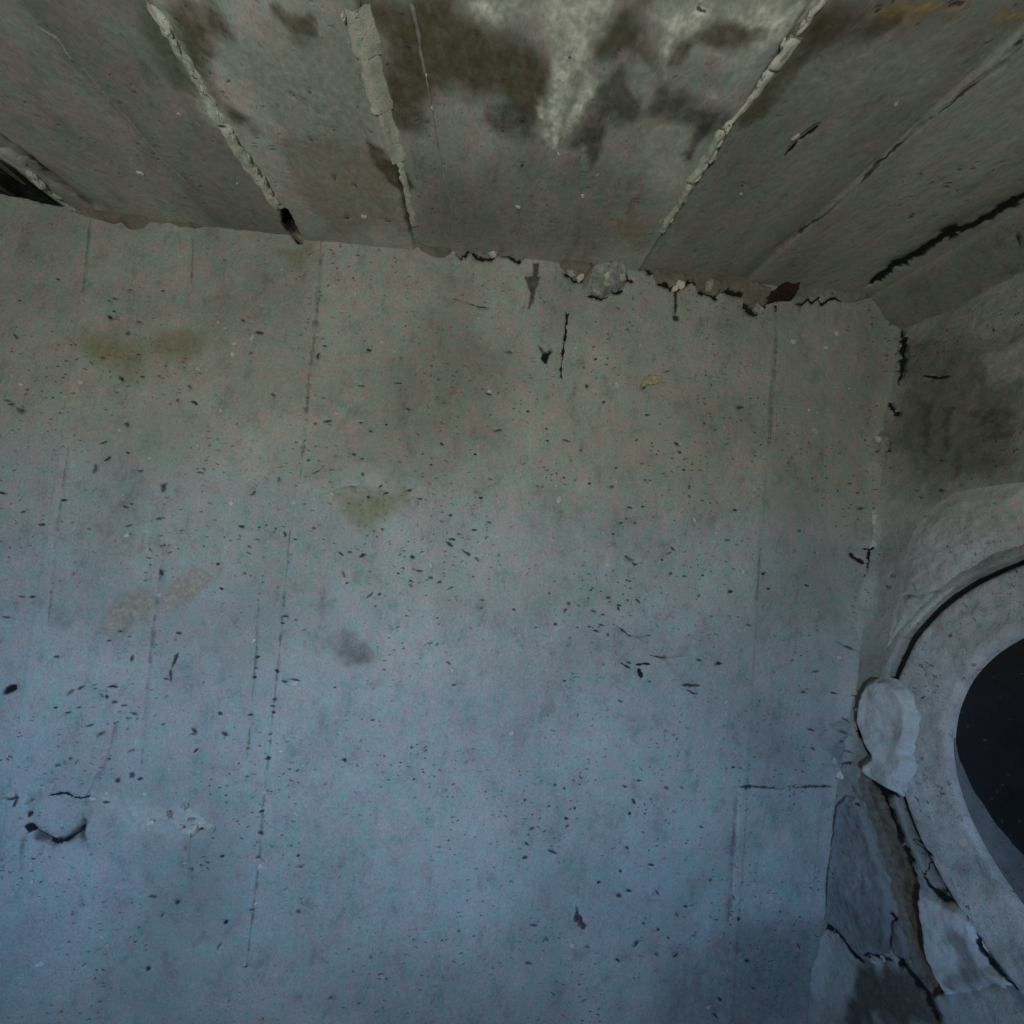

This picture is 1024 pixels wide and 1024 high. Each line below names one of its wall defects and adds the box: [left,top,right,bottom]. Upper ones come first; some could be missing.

leakage [660,0,816,66]
leakage [371,0,639,161]
crack [784,125,819,156]
spalling [559,260,627,296]
crack [559,263,842,378]
crack [888,330,950,416]
crack [9,792,89,844]
crack [836,715,959,907]
spalling [858,772,942,996]
crack [826,924,943,1020]
crack [977,932,1019,990]